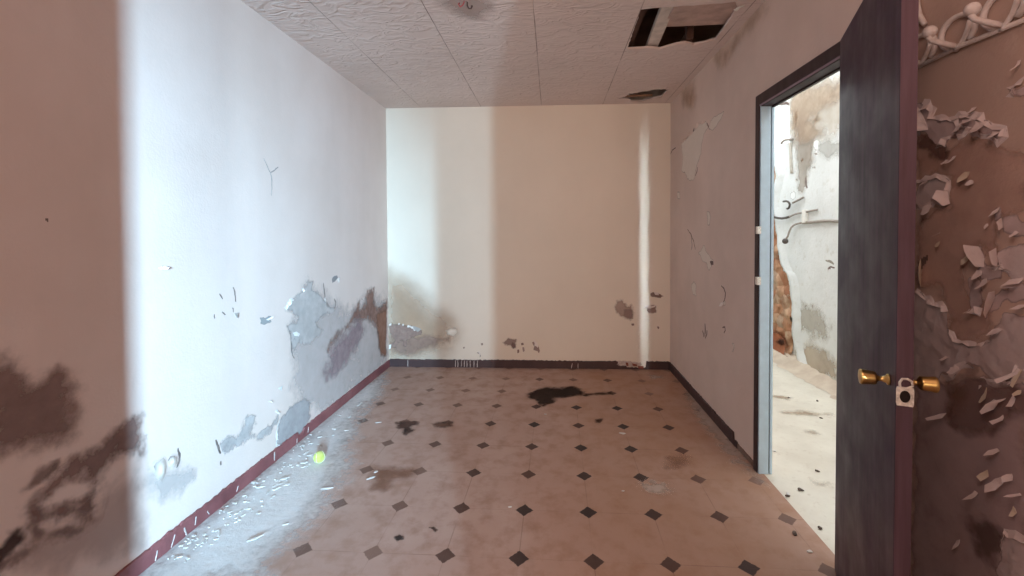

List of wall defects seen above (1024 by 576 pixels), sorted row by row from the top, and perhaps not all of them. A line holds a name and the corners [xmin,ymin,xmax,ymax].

peeling [916,99,1009,215]
peeling [284,276,340,358]
water stain [325,285,447,380]
peeling [913,207,1024,432]
peeling [167,389,367,560]